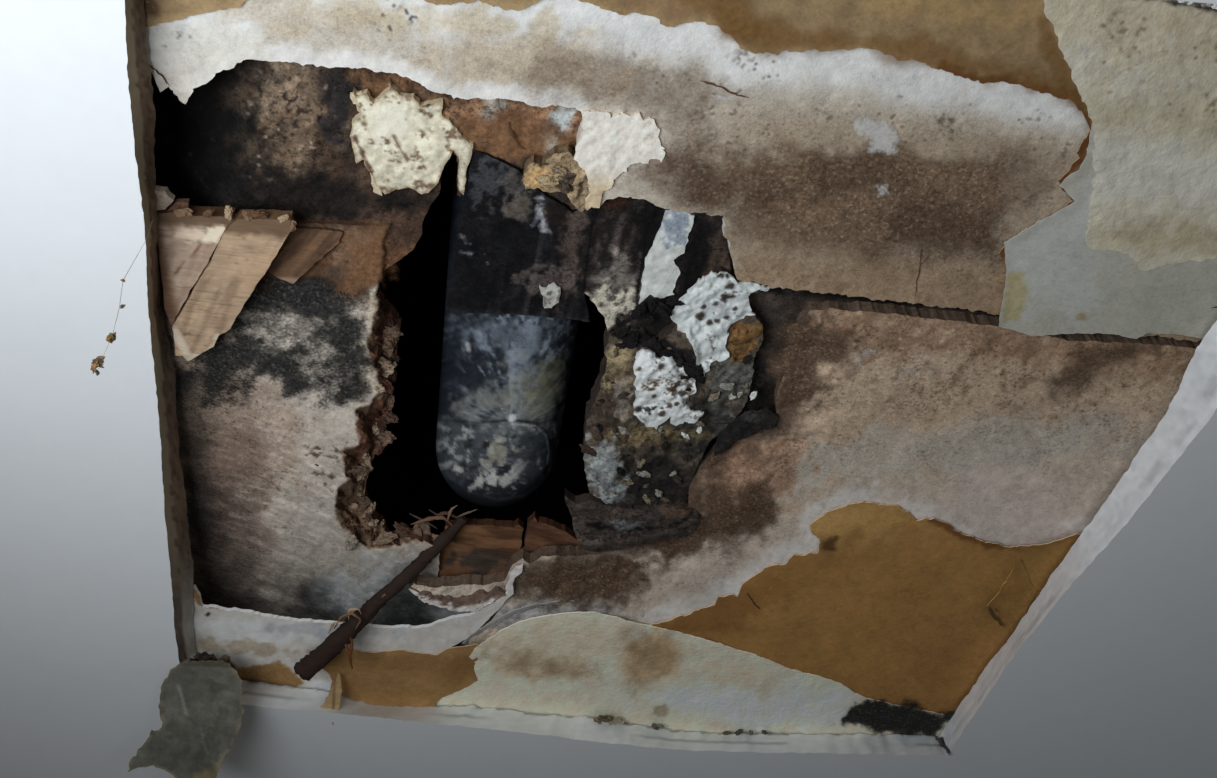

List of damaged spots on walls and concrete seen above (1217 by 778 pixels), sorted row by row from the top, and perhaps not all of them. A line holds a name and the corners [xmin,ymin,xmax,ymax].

flaking render [155,185,190,211]
flaking render [350,78,474,196]
flaking render [522,109,665,214]
water stain [646,118,1019,256]
peeling [1044,0,1217,271]
mould [180,276,375,410]
flaking render [579,265,770,507]
water stain [768,321,850,406]
water stain [1050,344,1158,394]
flaking render [409,564,523,612]
water stain [512,465,778,611]
mould [841,699,954,755]